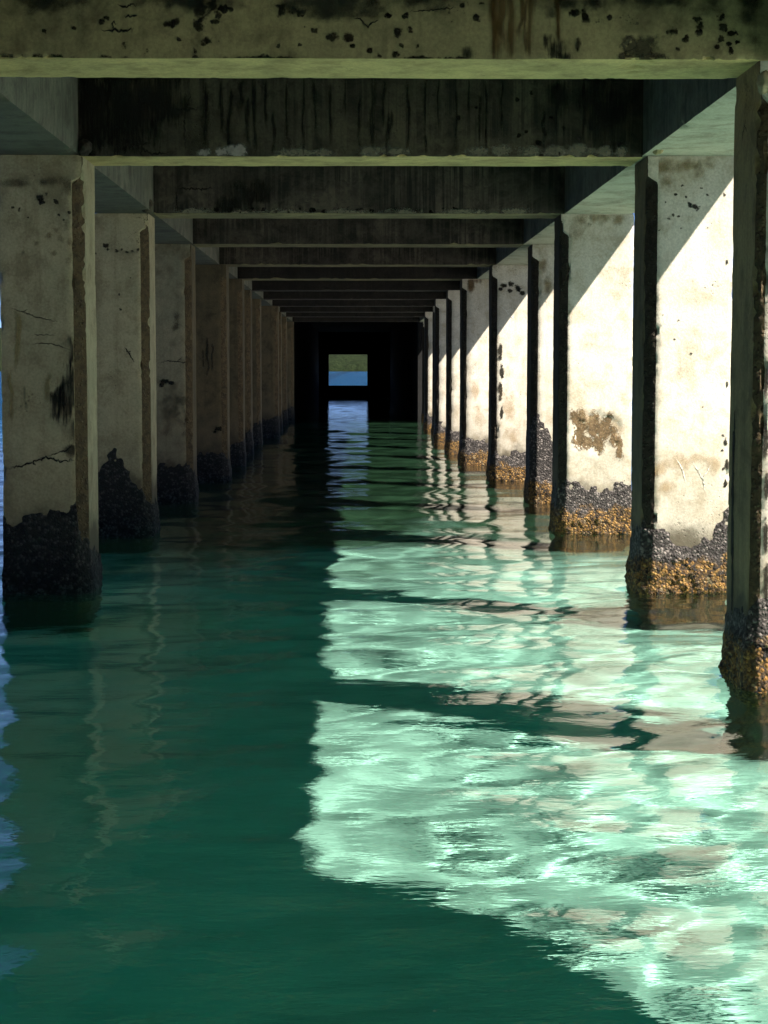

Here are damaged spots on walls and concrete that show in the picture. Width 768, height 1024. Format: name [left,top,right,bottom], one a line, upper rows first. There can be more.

damp [18,0,84,11]
damp [162,0,219,10]
damp [281,0,377,20]
damp [50,338,75,456]
spalling [570,409,624,458]
crack [14,443,74,469]